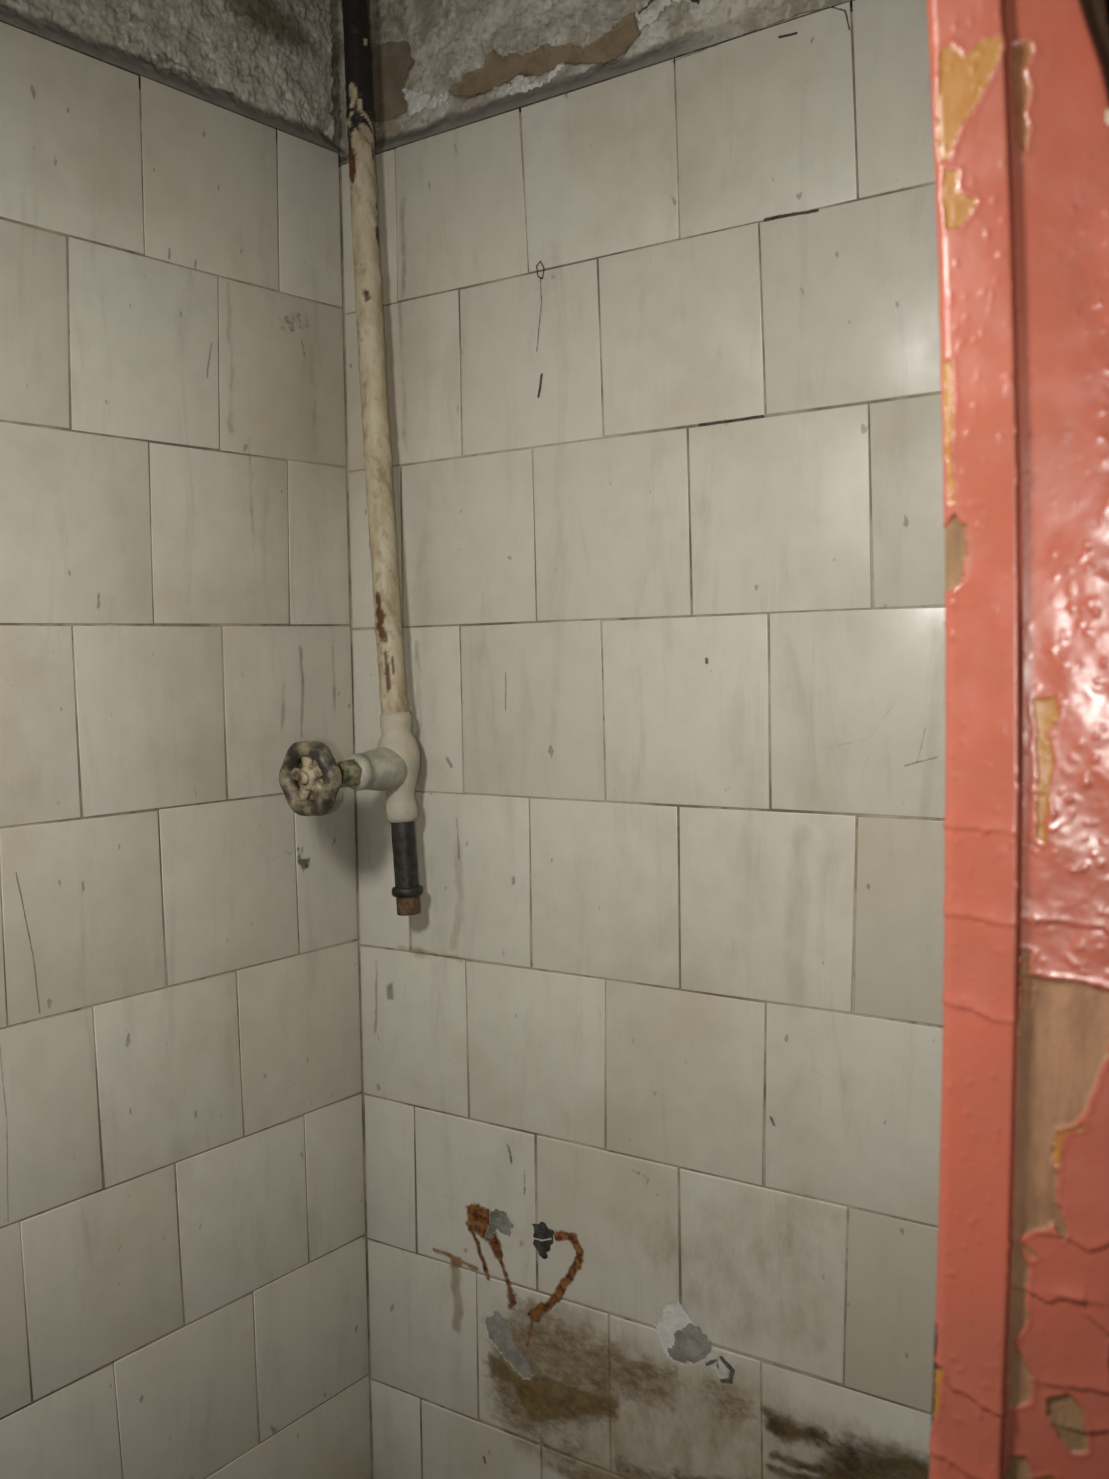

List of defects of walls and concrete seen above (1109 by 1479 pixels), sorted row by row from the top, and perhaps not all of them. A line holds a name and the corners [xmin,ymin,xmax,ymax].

peeling [370,0,699,123]
peeling [1011,41,1033,151]
peeling [944,514,967,593]
peeling [1006,951,1109,1454]
corrosion [433,1204,583,1346]
spalling [485,1311,532,1378]
spalling [654,1301,735,1383]
leakage [765,1410,929,1479]